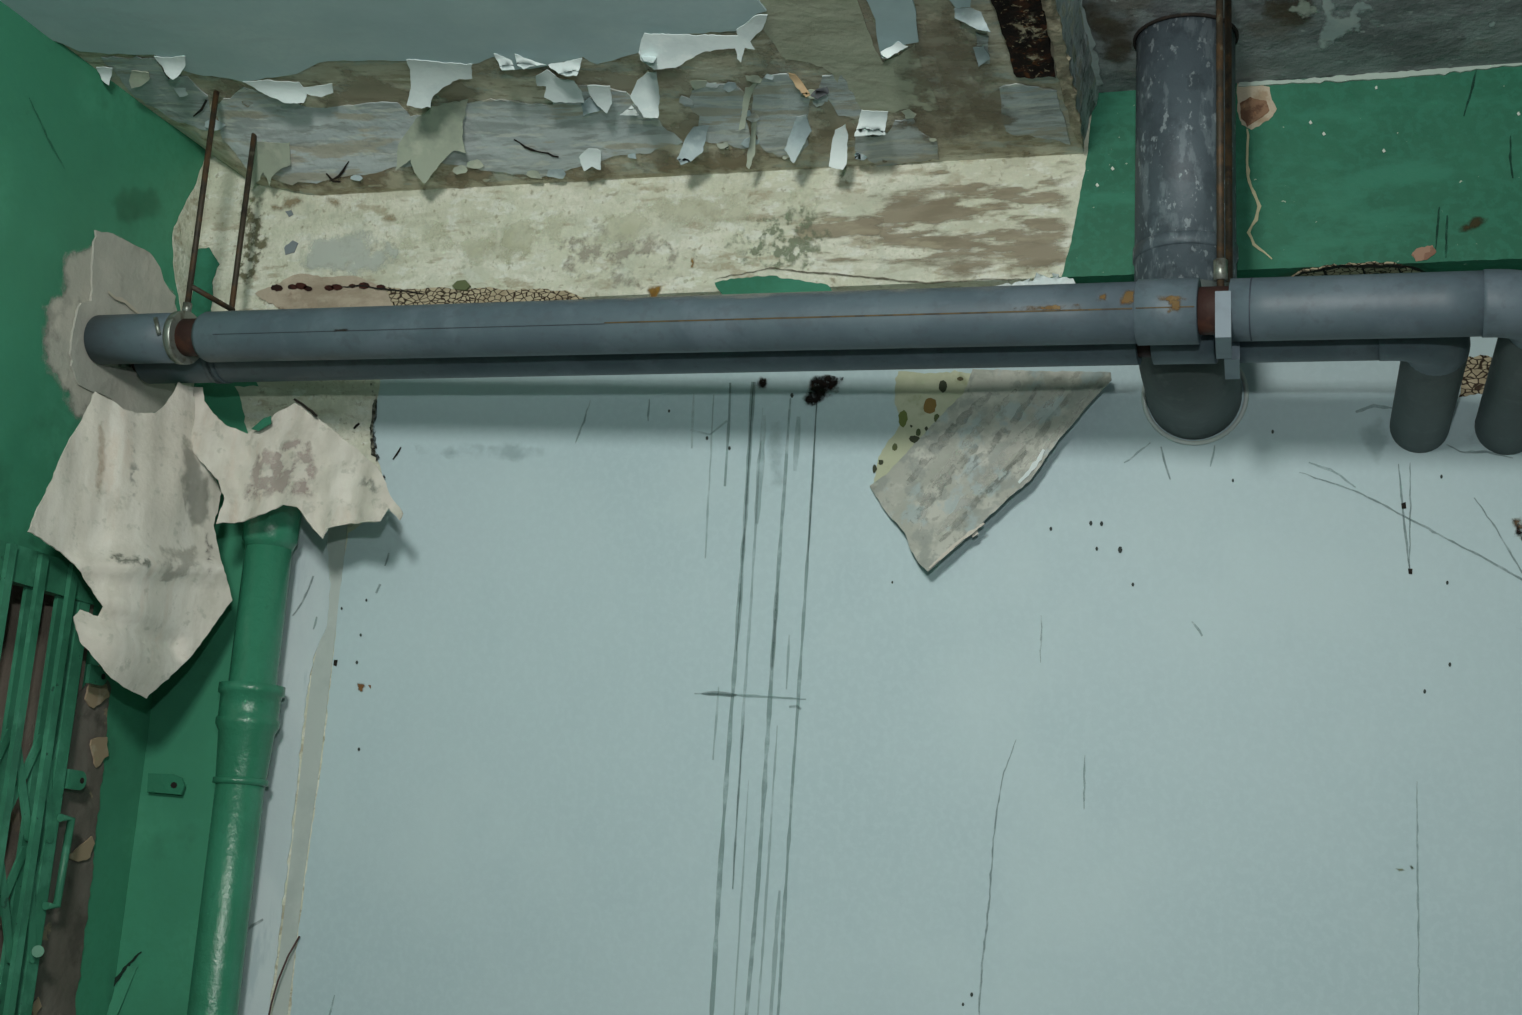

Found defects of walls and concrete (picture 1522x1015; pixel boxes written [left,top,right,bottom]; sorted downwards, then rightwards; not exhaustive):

peeling [96,0,1084,188]
peeling [172,162,204,311]
leakage [337,168,390,191]
leakage [444,170,492,189]
leakage [307,199,749,284]
leakage [545,166,610,182]
leakage [658,153,768,173]
leakage [750,170,1067,276]
peeling [235,385,382,474]
peeling [872,370,971,482]